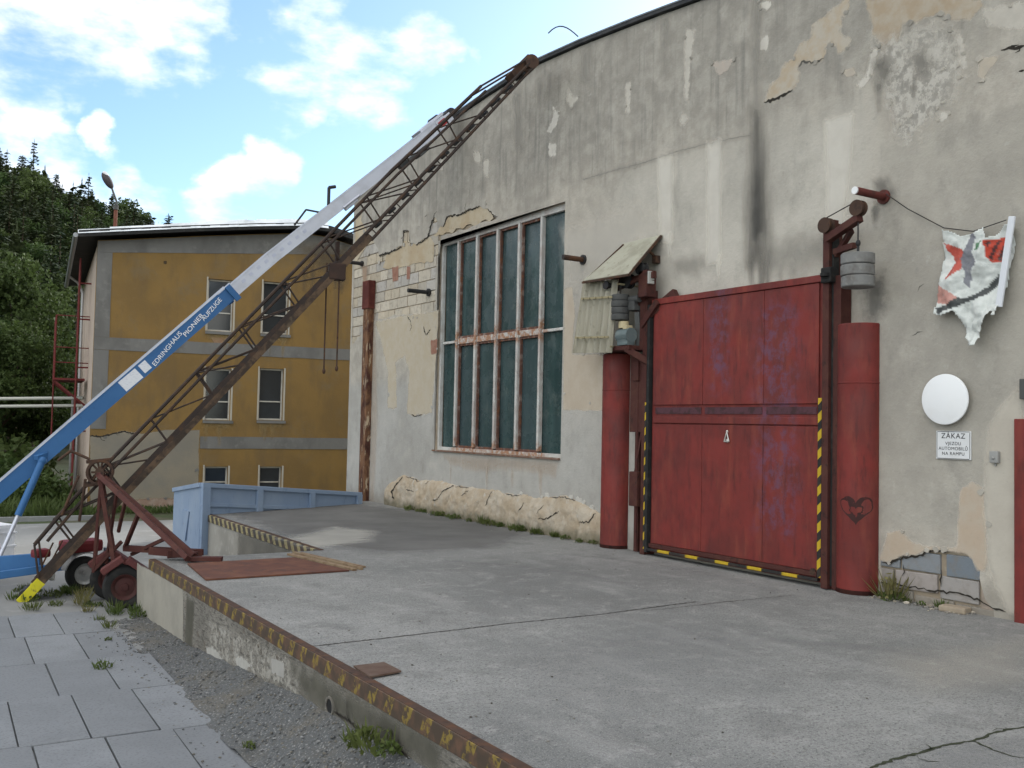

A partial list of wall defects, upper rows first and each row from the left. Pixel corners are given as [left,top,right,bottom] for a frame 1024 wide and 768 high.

peeling [546,92,580,157]
peeling [764,0,851,102]
leakage [875,58,889,95]
peeling [840,0,1024,145]
leakage [747,108,771,283]
spalling [352,200,494,416]
spalling [881,482,994,617]
crack [870,726,1024,768]